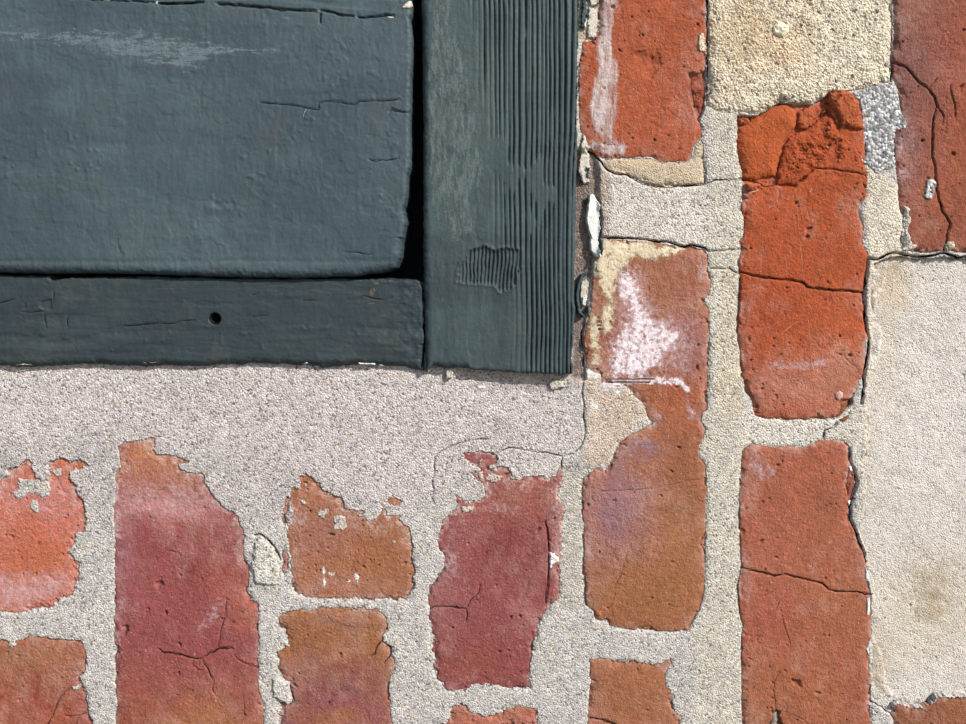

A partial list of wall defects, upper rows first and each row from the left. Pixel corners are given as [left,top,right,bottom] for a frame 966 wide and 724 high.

crack [90,0,393,22]
peeling [580,0,600,40]
peeling [424,0,484,241]
spalling [736,90,864,199]
peeling [583,196,604,255]
crack [587,0,966,404]
peeling [579,279,589,306]
leakage [599,265,690,392]
crack [432,325,585,503]
spalling [836,400,853,422]
crack [160,601,258,692]
crack [742,567,868,645]